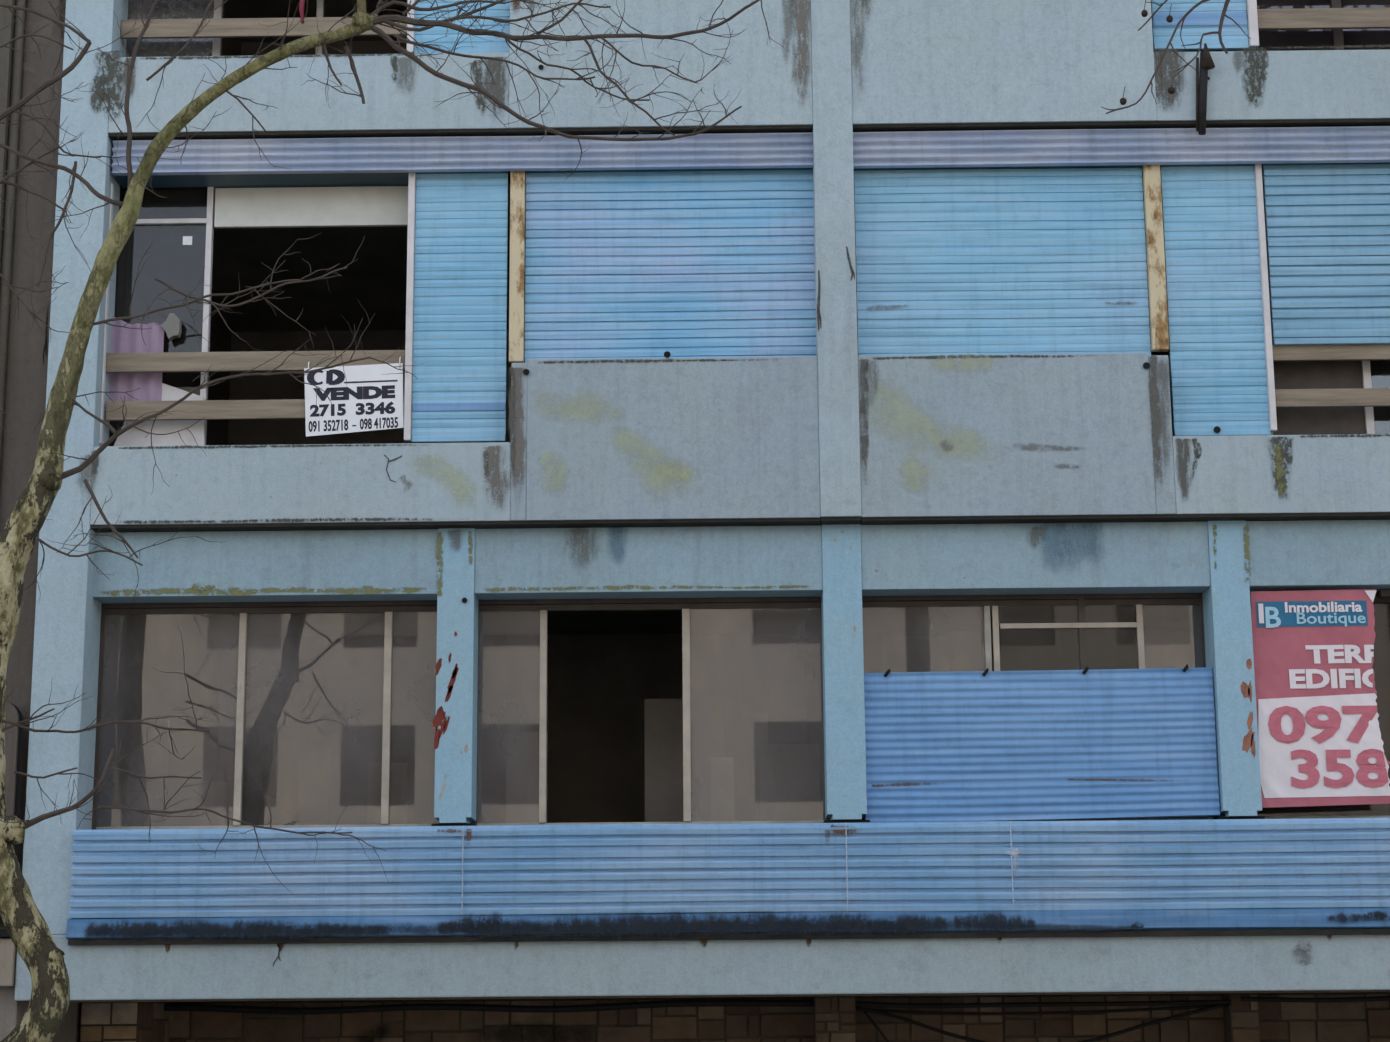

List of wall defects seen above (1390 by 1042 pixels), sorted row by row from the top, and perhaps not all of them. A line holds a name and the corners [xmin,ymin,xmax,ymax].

water stain [91,51,135,117]
water stain [784,0,811,97]
water stain [1155,48,1183,106]
water stain [1235,47,1268,103]
water stain [860,359,877,465]
water stain [1149,356,1202,497]
water stain [1270,437,1292,497]